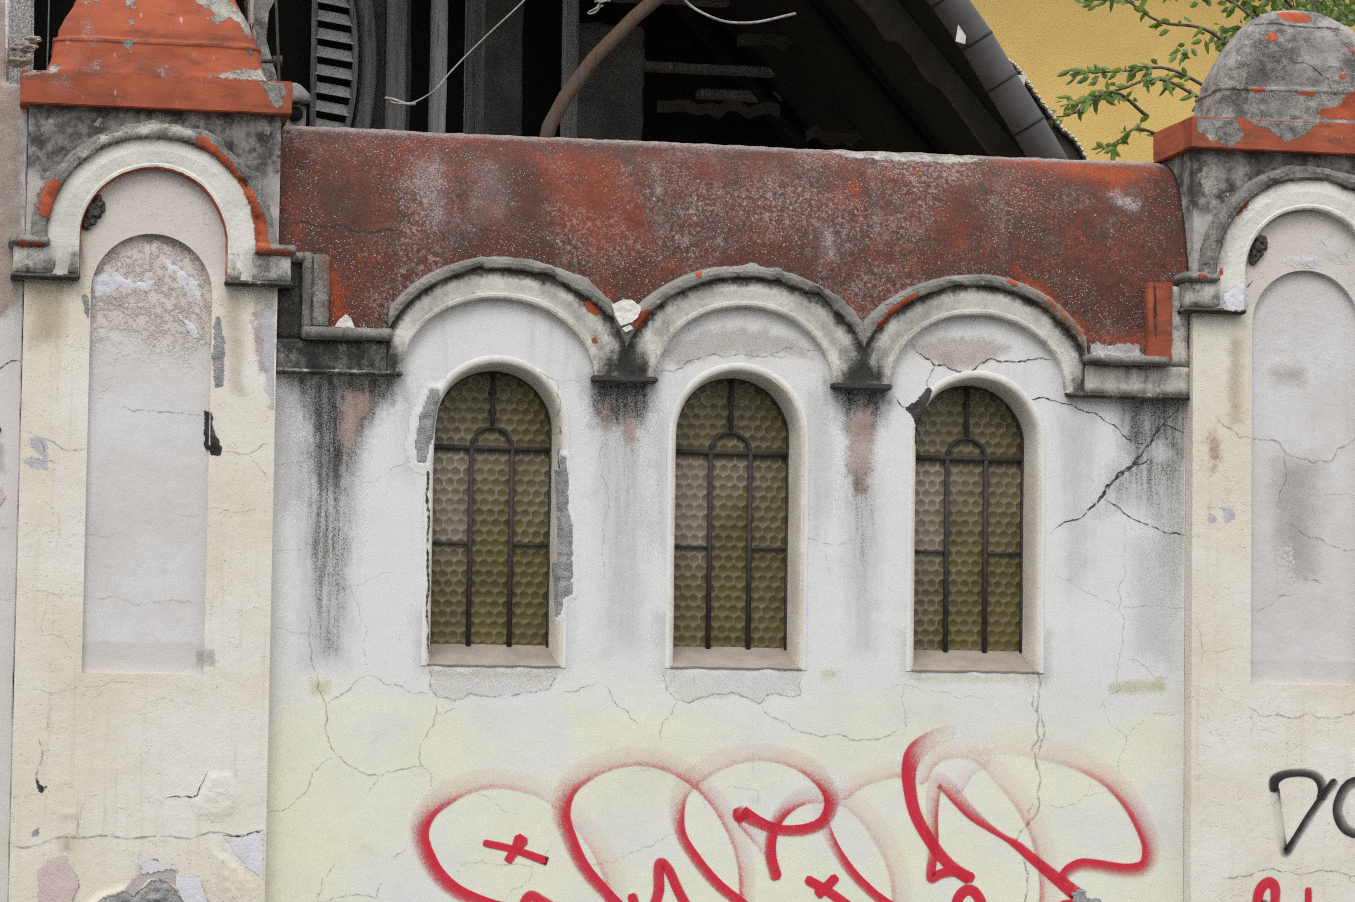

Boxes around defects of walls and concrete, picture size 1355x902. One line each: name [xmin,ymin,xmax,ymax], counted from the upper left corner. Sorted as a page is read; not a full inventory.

peeling [195,0,287,108]
peeling [832,151,983,165]
peeling [1197,68,1355,147]
peeling [1268,12,1312,42]
peeling [877,292,919,332]
crack [914,348,1051,386]
damp [284,282,400,658]
spalling [405,378,449,657]
spalling [552,450,580,624]
damp [824,340,894,611]
crack [1032,397,1185,535]
spalling [37,855,207,902]